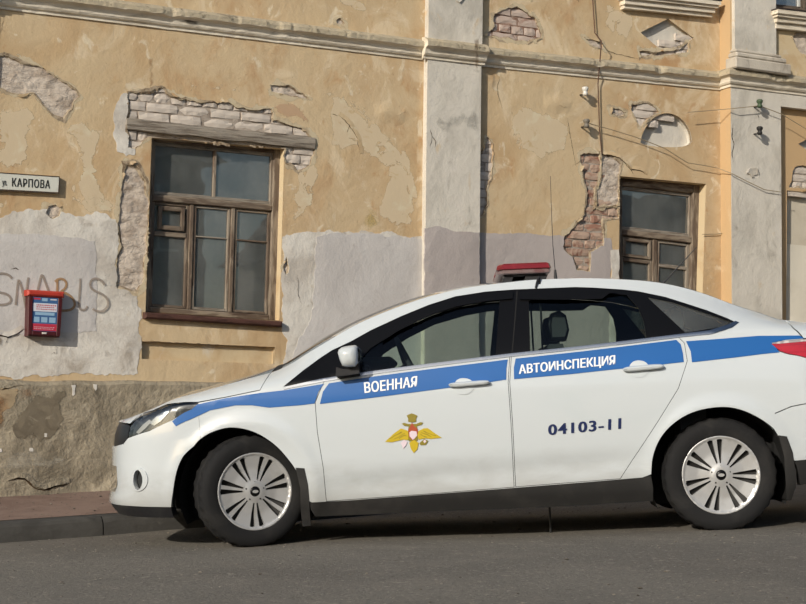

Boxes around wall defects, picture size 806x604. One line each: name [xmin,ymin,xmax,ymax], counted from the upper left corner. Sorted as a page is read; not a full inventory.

flaking render [482,3,544,45]
flaking render [636,33,692,61]
flaking render [791,32,806,57]
flaking render [0,52,105,208]
flaking render [114,78,319,297]
flaking render [480,134,496,219]
flaking render [787,165,806,198]
flaking render [40,202,63,219]
flaking render [561,147,625,272]